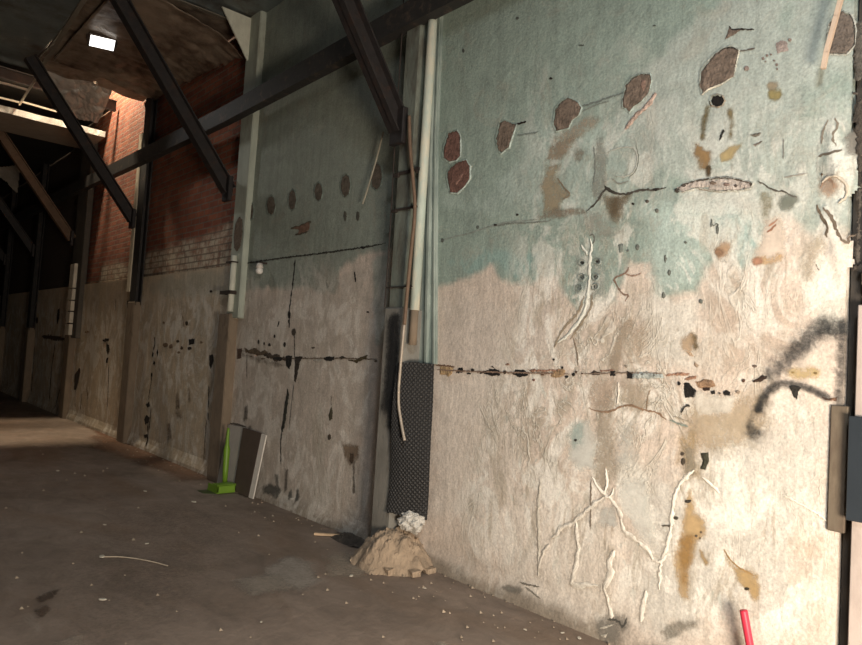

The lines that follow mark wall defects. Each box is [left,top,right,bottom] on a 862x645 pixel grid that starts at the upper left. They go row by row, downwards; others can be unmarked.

spalling [699,26,755,95]
peeling [762,38,792,70]
spalling [826,10,862,81]
spalling [552,73,657,132]
spalling [340,173,351,198]
spalling [442,130,472,195]
spalling [495,119,538,155]
crack [587,185,666,213]
spalling [853,92,862,270]
crack [247,243,383,462]
leakage [502,320,764,643]